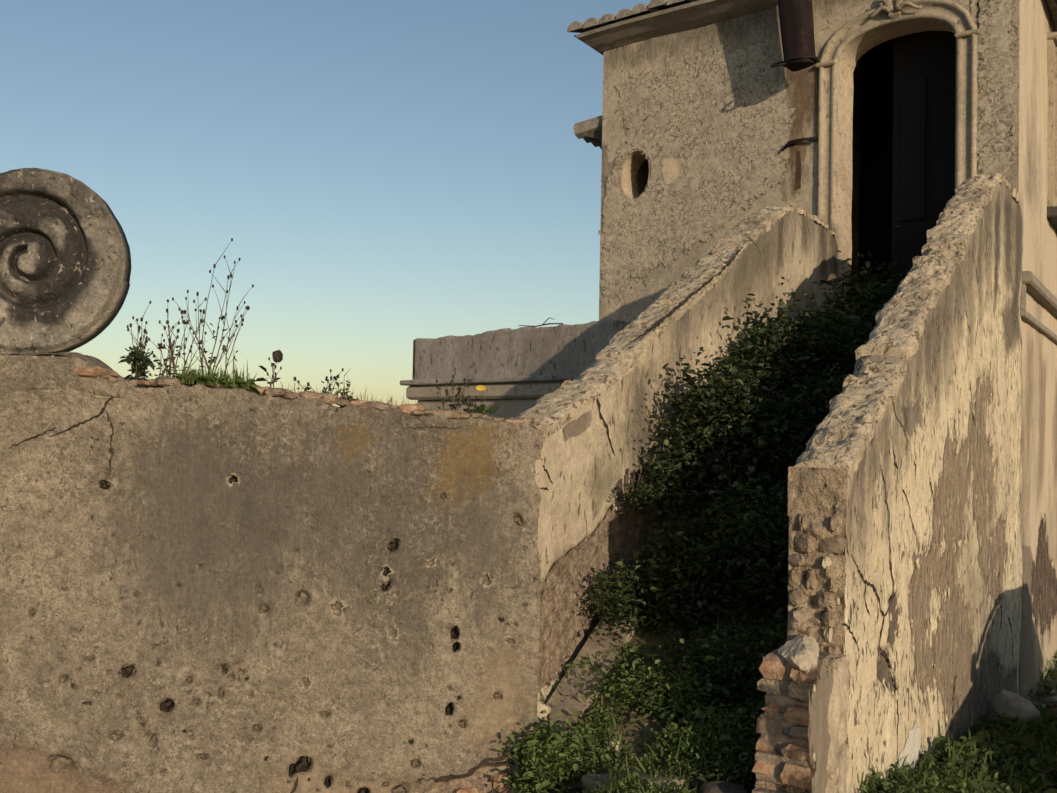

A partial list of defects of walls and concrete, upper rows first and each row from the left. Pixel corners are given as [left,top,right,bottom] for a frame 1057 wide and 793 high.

crack [7,389,120,469]
crack [597,397,615,456]
spalling [538,472,677,690]
crack [845,402,935,755]
peeling [873,364,1018,740]
spalling [1031,513,1057,639]